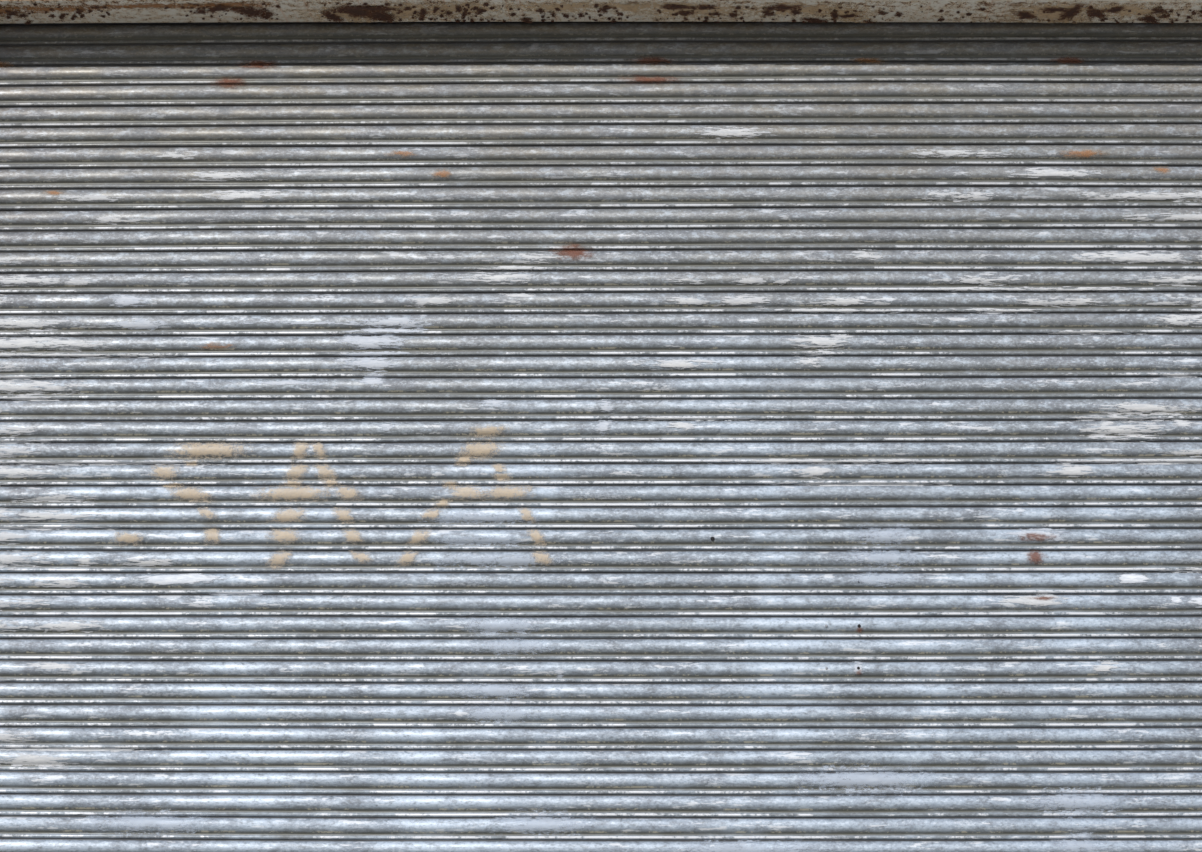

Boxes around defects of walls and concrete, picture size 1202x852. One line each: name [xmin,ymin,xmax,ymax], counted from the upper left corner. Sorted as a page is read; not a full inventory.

corrosion [307,2,877,23]
corrosion [997,3,1171,23]
corrosion [631,57,676,83]
peeling [147,151,290,202]
peeling [910,149,1202,222]
peeling [451,251,570,297]
corrosion [556,244,591,259]
peeling [660,277,899,313]
peeling [934,251,1202,335]
peeling [240,295,456,388]
peeling [0,256,225,634]
corrosion [1021,533,1047,564]